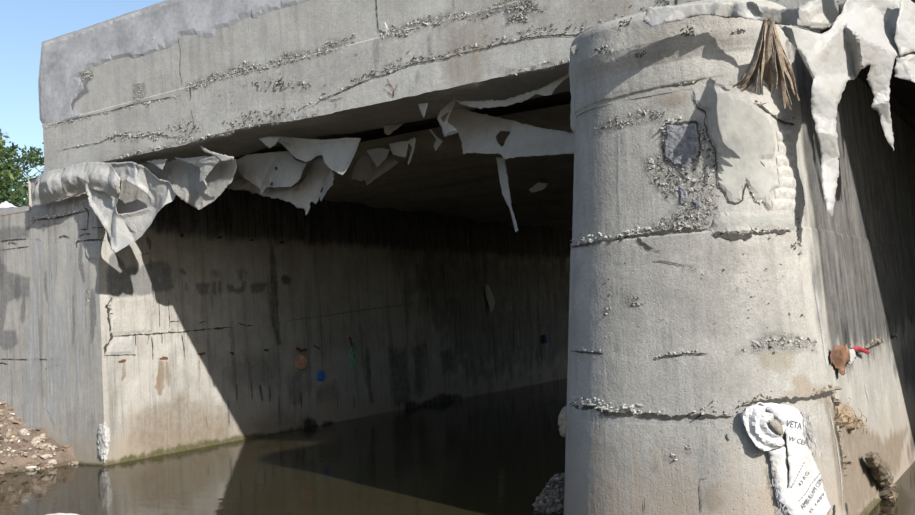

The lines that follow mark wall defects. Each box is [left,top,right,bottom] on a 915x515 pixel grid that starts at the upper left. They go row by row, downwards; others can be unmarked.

crack [46,39,195,152]
crack [305,15,623,106]
crack [570,77,796,269]
water stain [795,48,915,362]
peeling [85,241,101,262]
water stain [107,255,173,297]
crack [107,292,260,356]
crack [567,387,835,441]